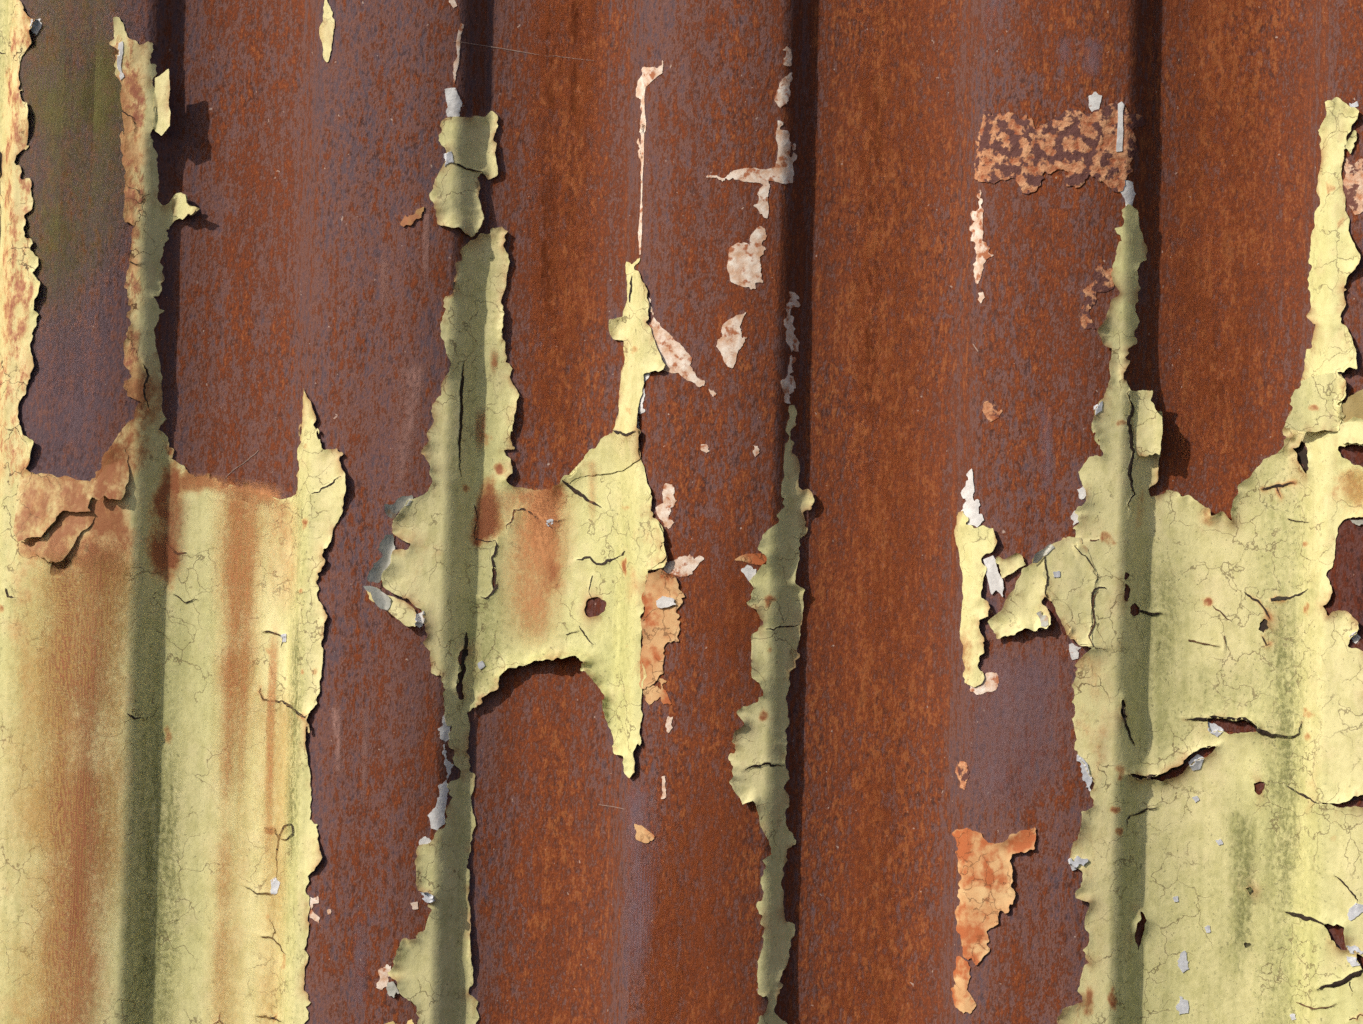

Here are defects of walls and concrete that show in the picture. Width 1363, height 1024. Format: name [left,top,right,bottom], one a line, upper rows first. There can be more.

rust [26,563,125,1024]
peeling [0,0,346,1024]
rust [267,655,277,783]
rust [332,708,340,769]
peeling [363,111,685,1024]
crack [458,360,601,599]
rust [513,492,560,629]
peeling [728,355,815,1024]
peeling [952,97,1363,1024]
crack [1122,700,1302,826]
crack [1188,590,1306,646]
crack [1296,969,1363,1020]